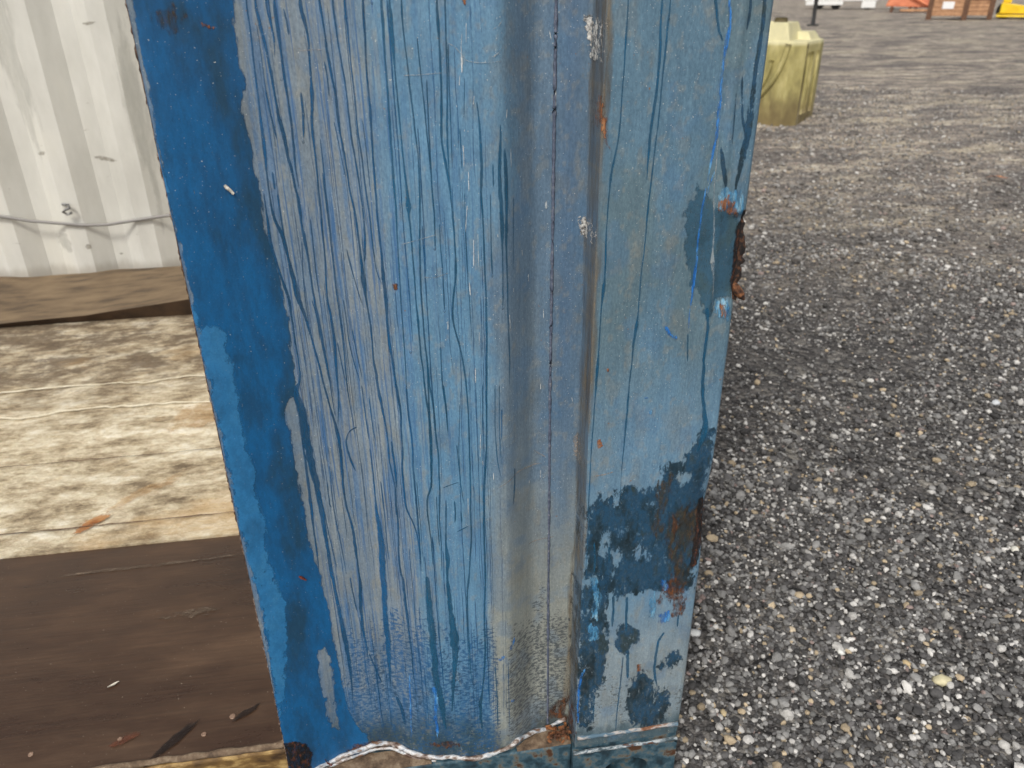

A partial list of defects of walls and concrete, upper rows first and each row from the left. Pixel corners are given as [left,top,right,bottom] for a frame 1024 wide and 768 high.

peeling [583,15,607,60]
corrosion [591,0,612,156]
corrosion [730,220,745,301]
corrosion [652,473,704,617]
peeling [587,578,600,641]
corrosion [549,649,577,738]